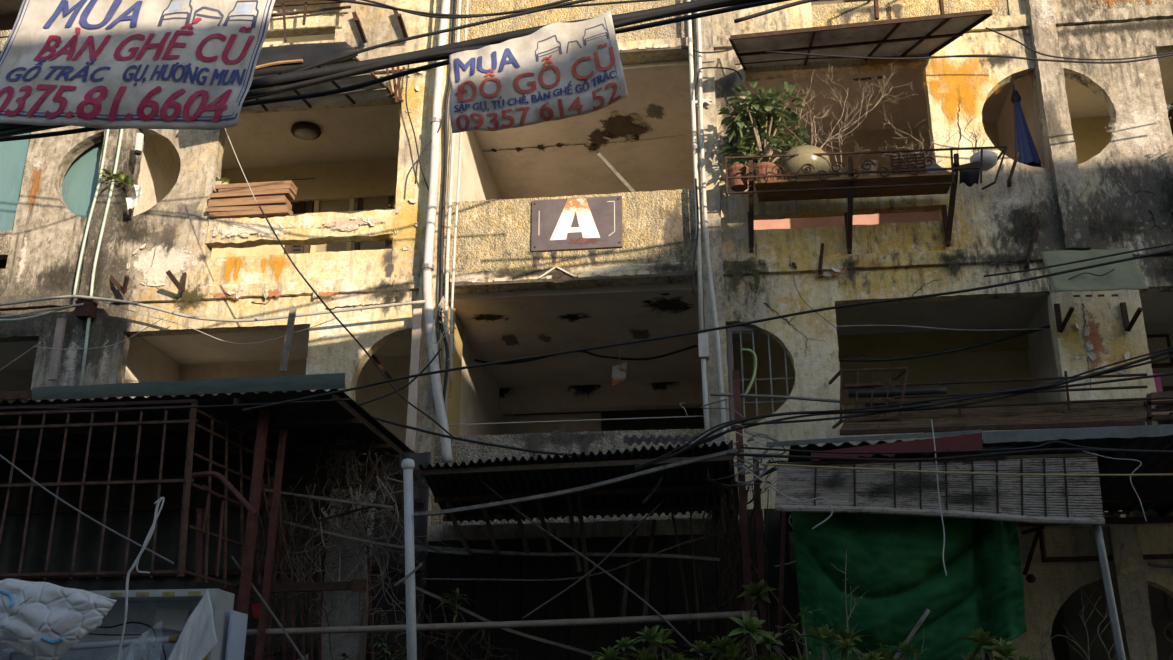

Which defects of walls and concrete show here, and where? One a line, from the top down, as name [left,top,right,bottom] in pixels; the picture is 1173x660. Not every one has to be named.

water stain [852,53,1014,122]
corrosion [27,167,42,208]
spalling [204,198,417,238]
water stain [938,191,1047,277]
peeling [140,277,179,286]
corrosion [224,252,241,281]
corrosion [261,256,285,281]
flaking render [1075,309,1130,374]